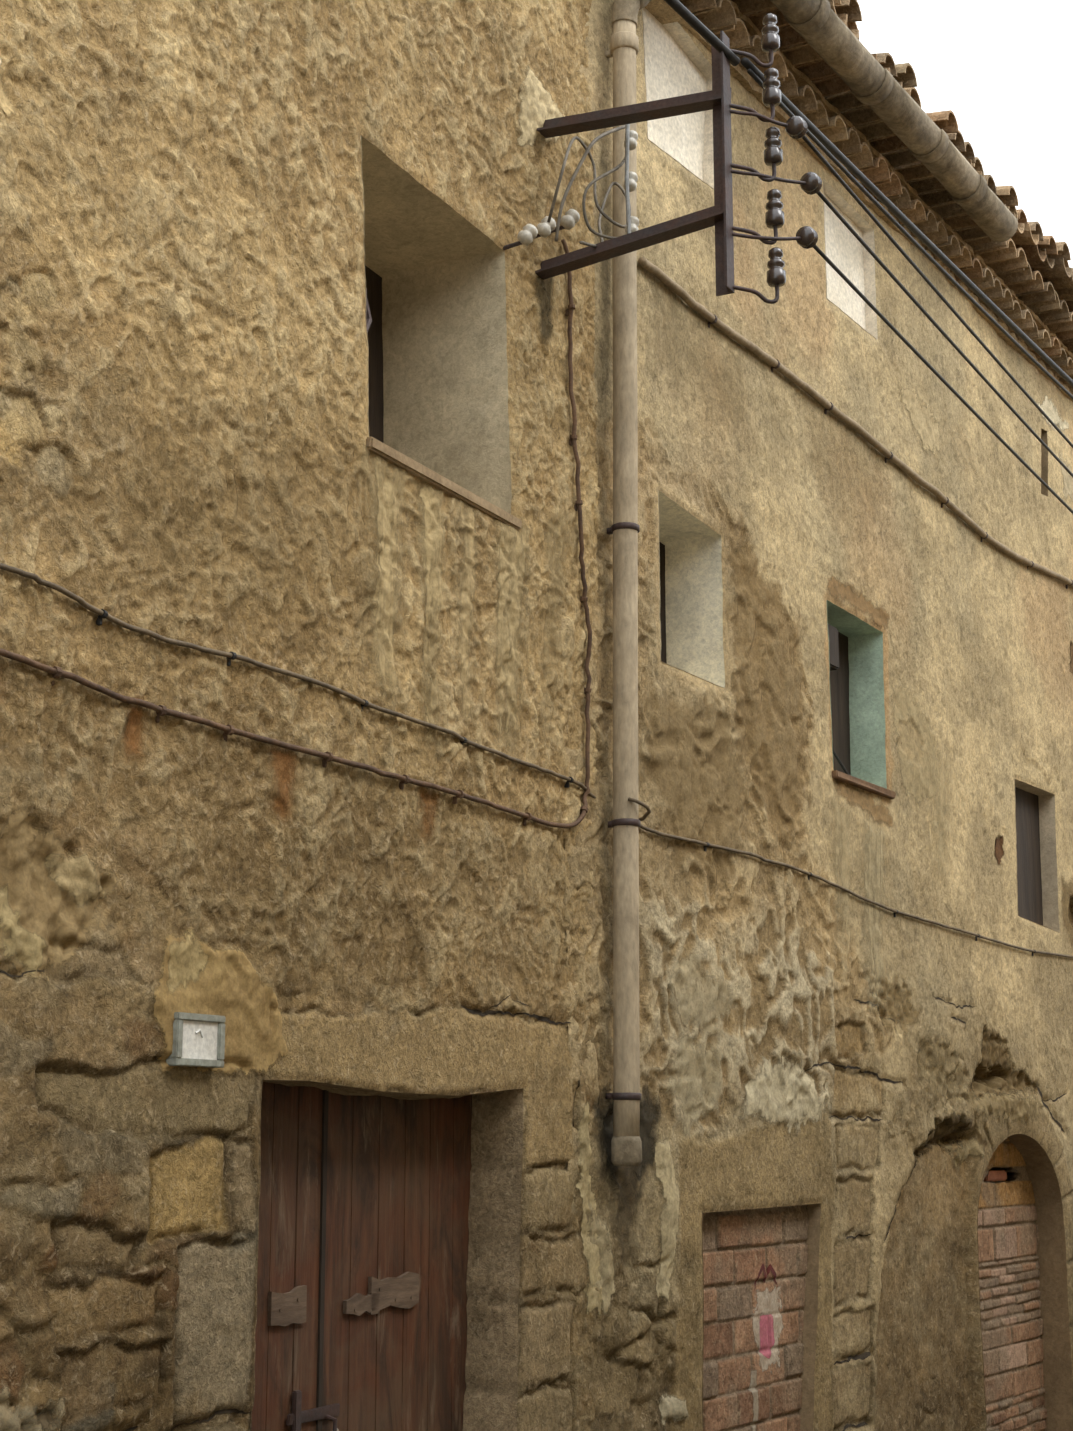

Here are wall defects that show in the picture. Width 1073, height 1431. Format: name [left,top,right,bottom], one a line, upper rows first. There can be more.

peeling [0,58,15,116]
spalling [1062,878,1073,946]
crack [805,1062,903,1084]
crack [830,1114,883,1122]
spalling [874,972,1041,1241]
peeling [0,1387,65,1431]